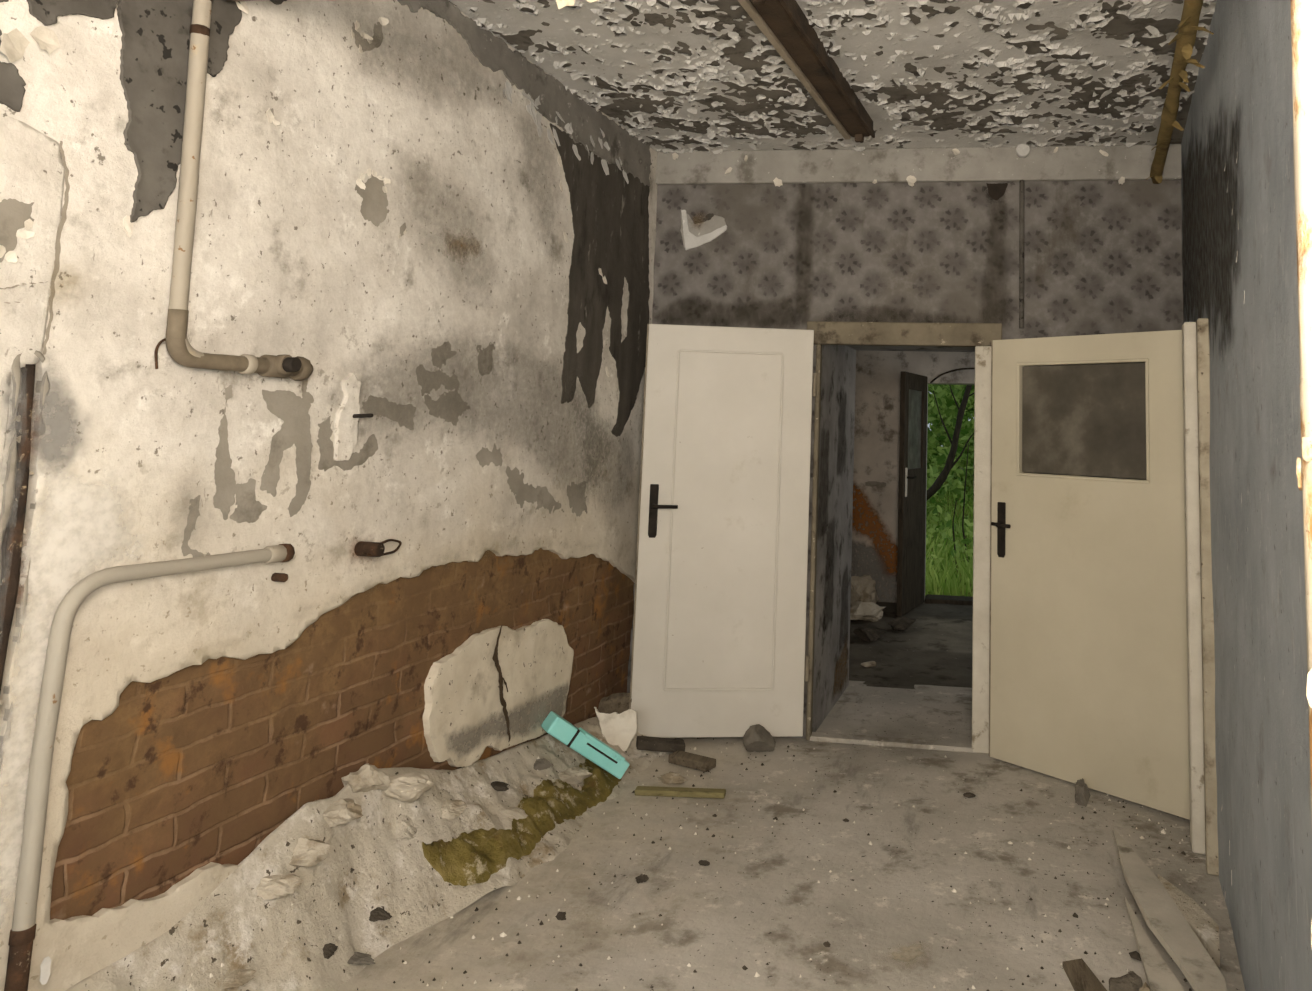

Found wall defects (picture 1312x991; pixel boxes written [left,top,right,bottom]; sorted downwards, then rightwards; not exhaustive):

peeling [0,26,60,63]
spalling [351,17,389,53]
peeling [449,0,1217,184]
spalling [476,342,495,376]
spalling [181,341,471,557]
spalling [476,445,587,517]
flaking render [50,548,634,920]
crack [492,625,511,742]